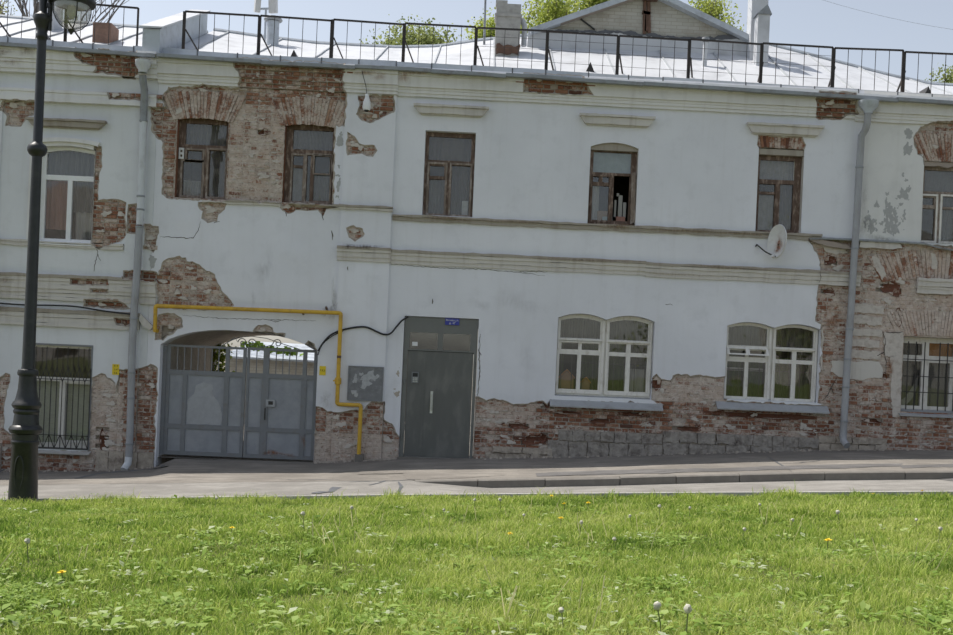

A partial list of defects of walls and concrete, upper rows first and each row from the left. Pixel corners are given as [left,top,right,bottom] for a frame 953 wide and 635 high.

spalling [0,99,34,127]
spalling [107,57,395,223]
spalling [757,135,806,150]
spalling [903,121,953,162]
spalling [69,146,234,340]
spalling [346,225,365,242]
spalling [473,172,953,458]
spalling [0,373,12,471]
spalling [38,364,158,471]
spalling [314,370,400,462]